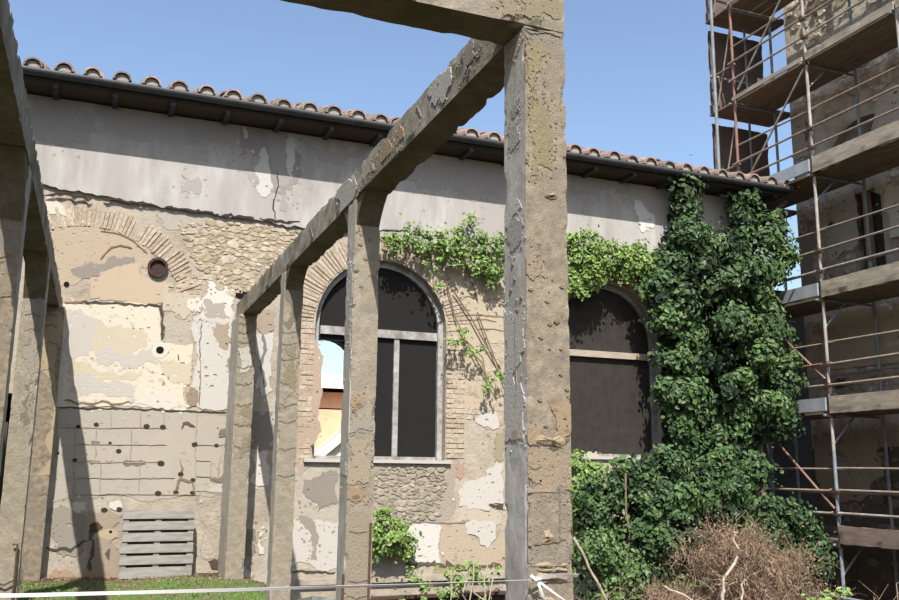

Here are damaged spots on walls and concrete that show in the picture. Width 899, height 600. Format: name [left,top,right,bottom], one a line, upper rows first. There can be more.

crack [45,169,300,224]
peeling [629,184,666,233]
flaking render [37,196,302,579]
peeling [291,328,506,600]